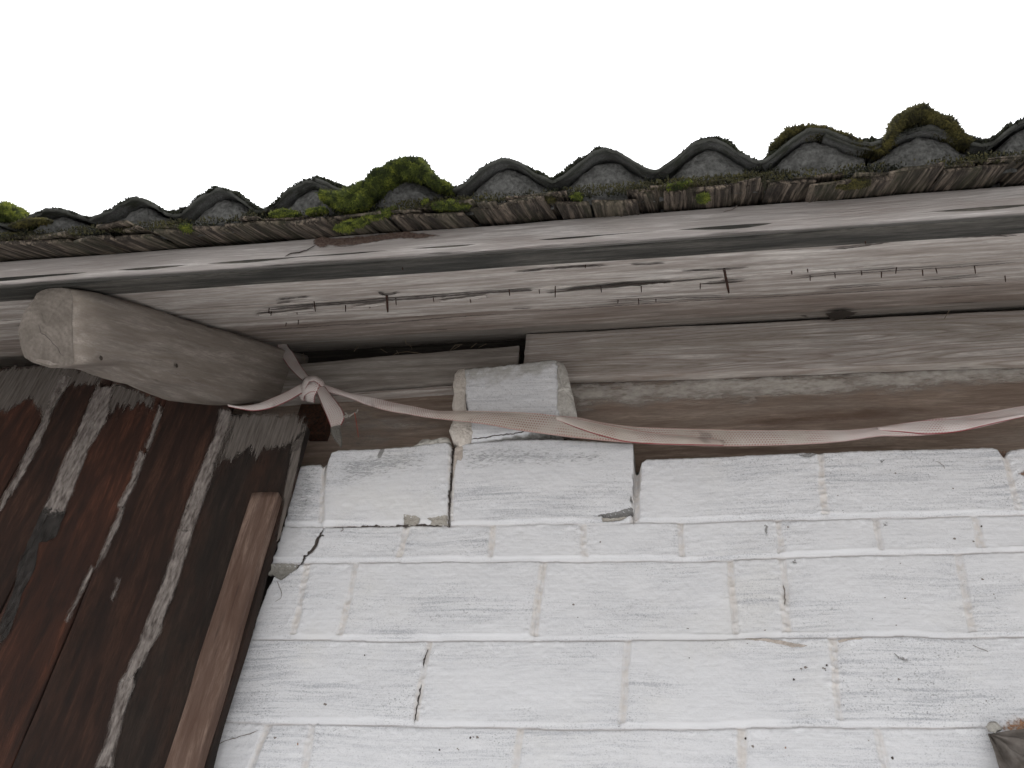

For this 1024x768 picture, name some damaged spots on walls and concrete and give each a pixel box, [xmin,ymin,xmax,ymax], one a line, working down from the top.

crack [275,431,524,602]
crack [414,650,428,721]